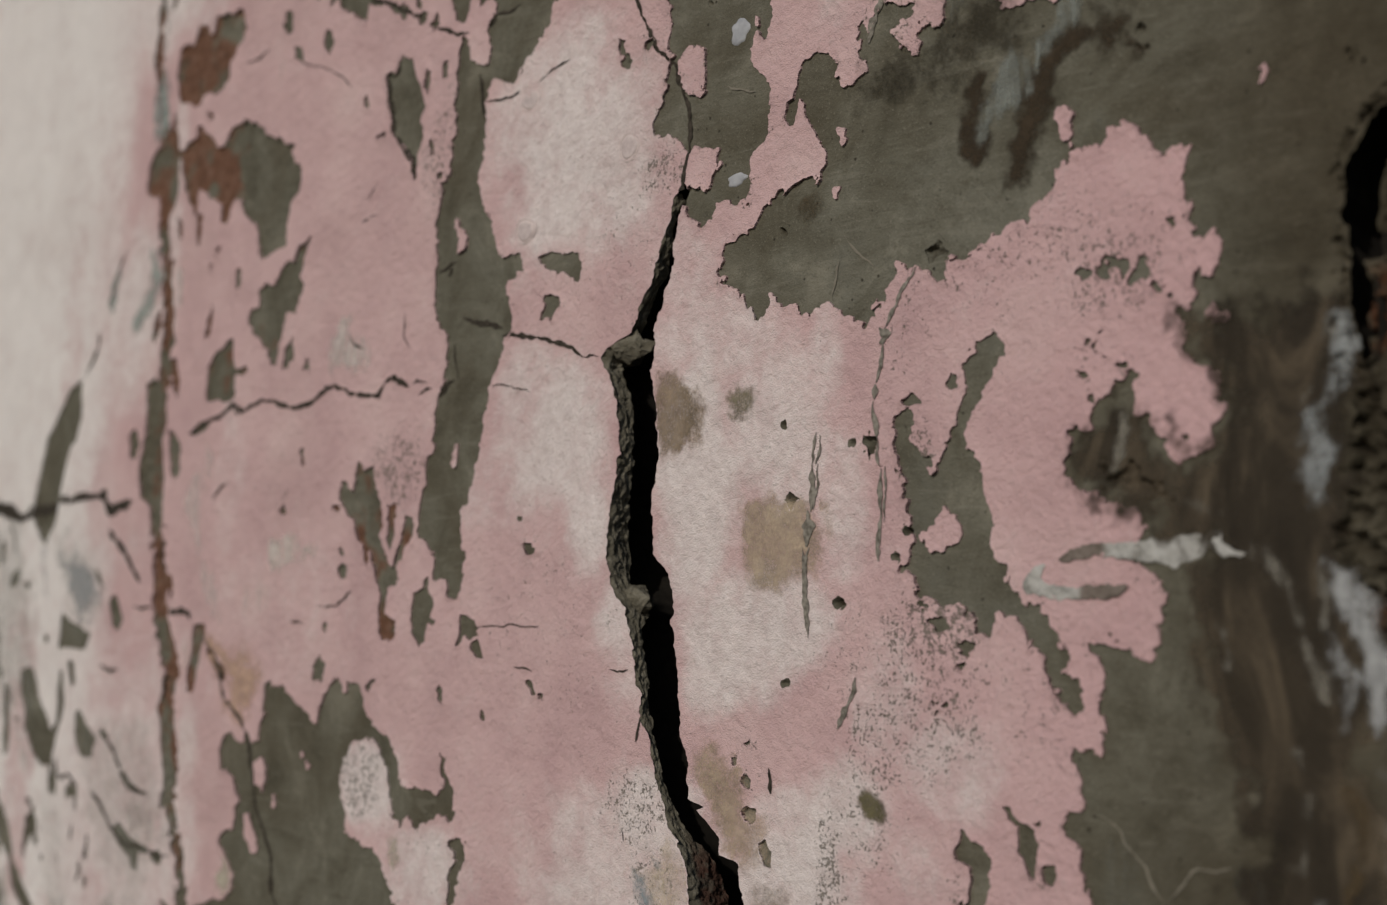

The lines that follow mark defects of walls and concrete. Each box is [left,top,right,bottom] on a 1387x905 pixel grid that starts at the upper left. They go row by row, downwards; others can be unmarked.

crack [0,489,276,905]
peeling [114,0,455,905]
peeling [331,0,558,646]
peeling [448,838,465,905]
crack [189,0,744,905]
peeling [457,615,483,658]
peeling [540,252,582,282]
crack [766,768,774,794]
spalling [832,596,847,610]
peeling [646,0,1387,596]
peeling [848,332,1285,905]
damp [1070,290,1387,905]